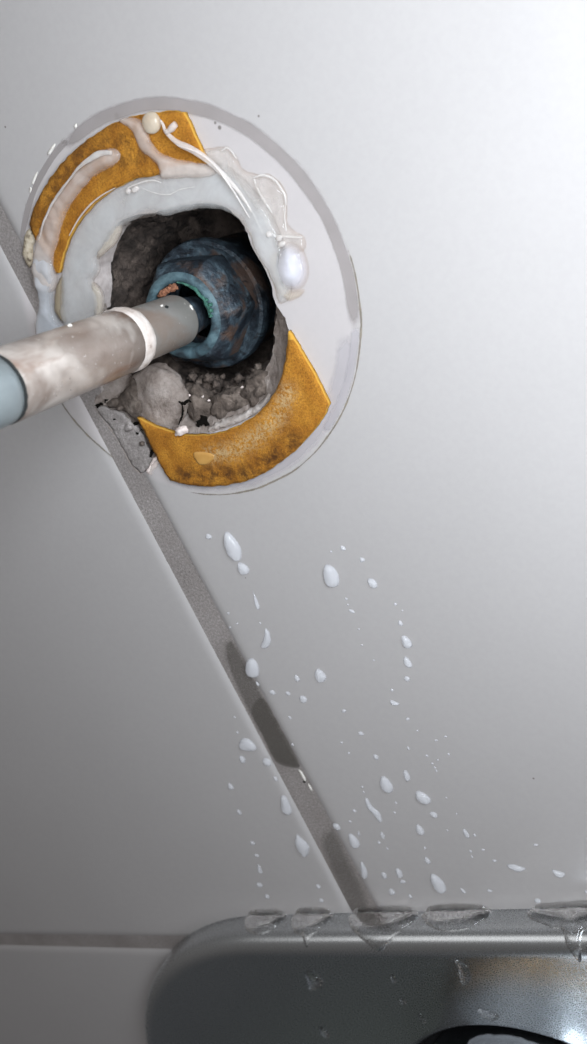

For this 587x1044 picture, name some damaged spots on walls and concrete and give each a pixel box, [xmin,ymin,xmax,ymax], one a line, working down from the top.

hole [100,203,247,314]
spalling [93,305,289,474]